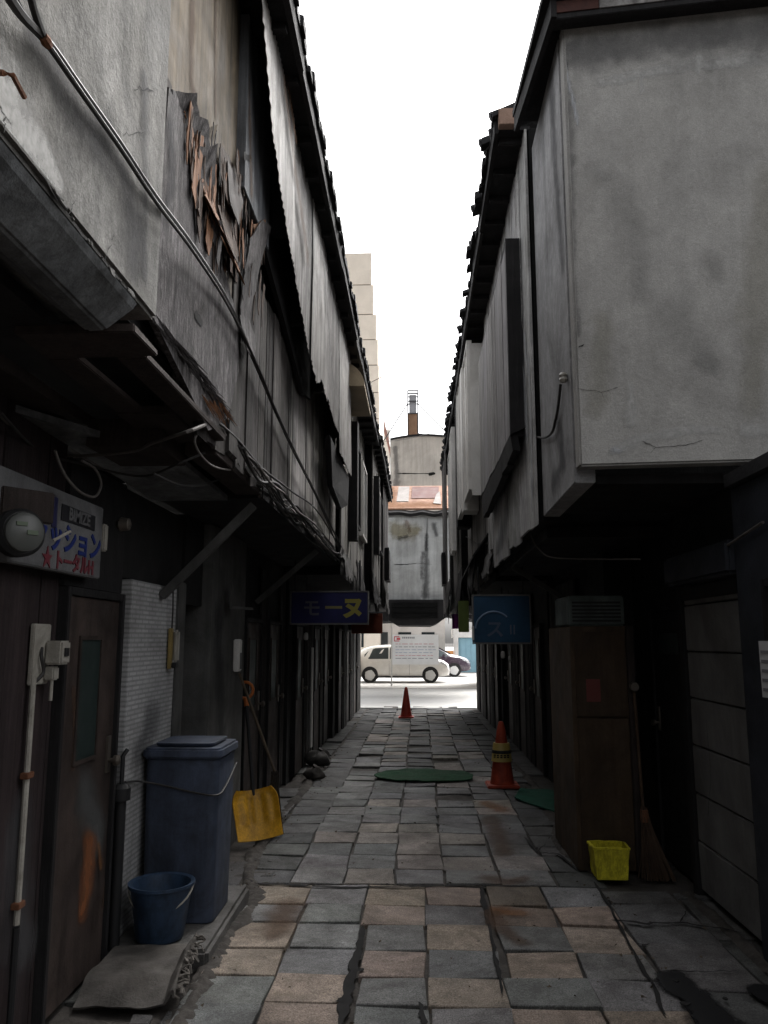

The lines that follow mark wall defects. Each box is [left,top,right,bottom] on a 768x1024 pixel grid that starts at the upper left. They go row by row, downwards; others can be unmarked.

peeling [176,91,266,360]
crack [336,925,365,1024]
crack [244,877,549,994]
crack [524,837,738,1015]